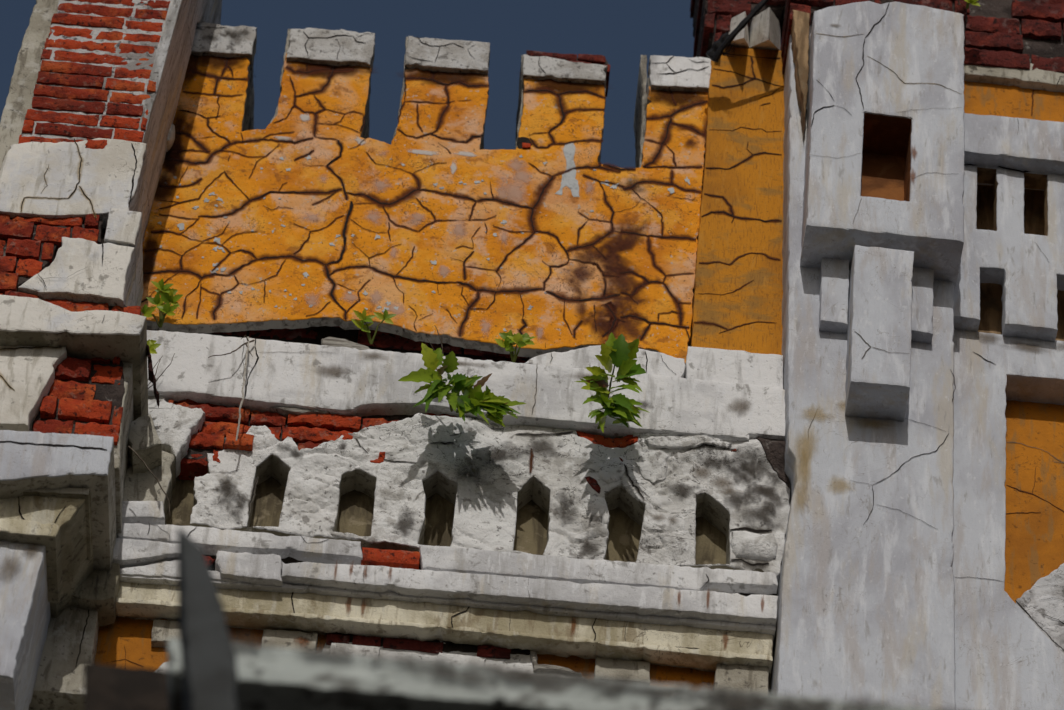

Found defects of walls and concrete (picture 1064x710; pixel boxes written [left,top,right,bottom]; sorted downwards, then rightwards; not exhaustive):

crack [811,4,961,126]
crack [21,139,104,288]
crack [128,12,783,473]
flaking render [555,142,619,197]
spalling [147,345,457,481]
crack [624,464,644,499]
spalling [576,431,737,462]
spalling [756,437,790,488]
crack [851,418,949,529]
crack [1006,442,1064,514]
spalling [1015,563,1064,653]
spalling [323,632,582,675]